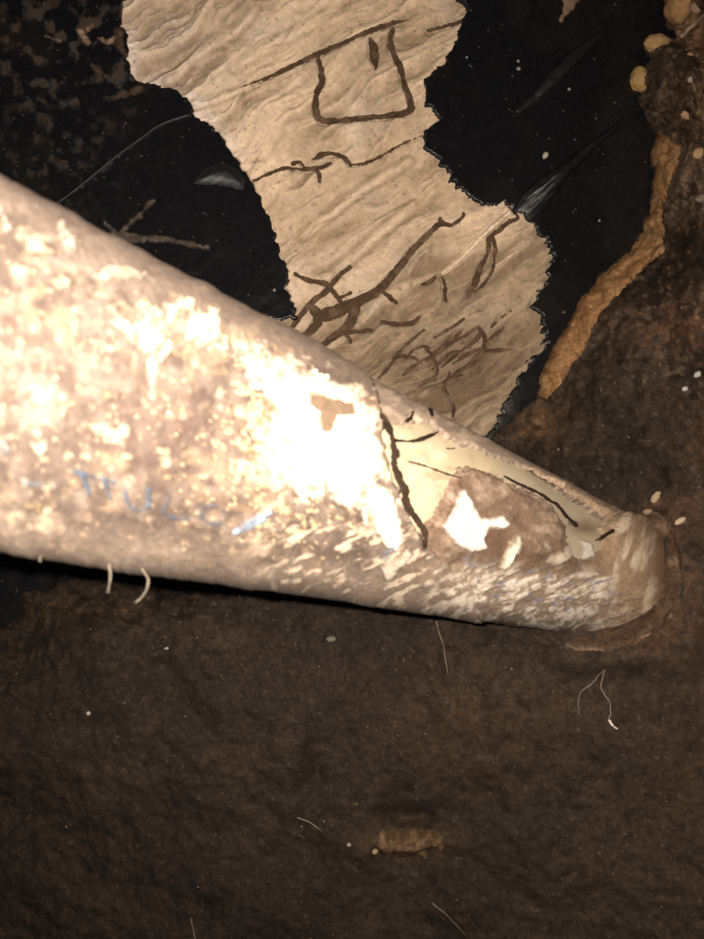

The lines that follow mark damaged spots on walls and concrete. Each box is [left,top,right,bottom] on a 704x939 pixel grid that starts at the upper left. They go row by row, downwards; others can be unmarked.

crack [290,205,520,550]
peeling [444,491,510,552]
crack [503,475,615,541]
peeling [499,536,523,570]
peeling [546,539,595,567]